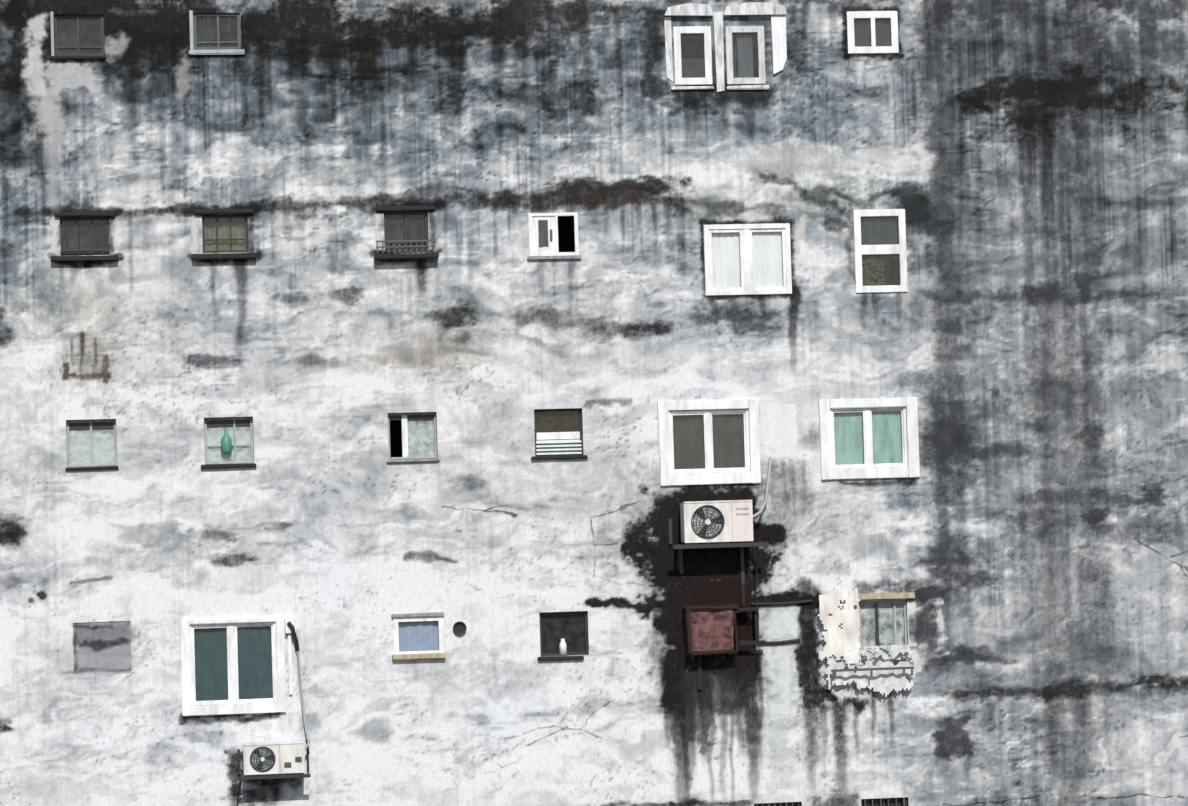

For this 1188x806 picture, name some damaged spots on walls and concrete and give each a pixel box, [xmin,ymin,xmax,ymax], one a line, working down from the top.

damp [0,0,774,142]
damp [15,203,208,217]
damp [231,185,520,218]
damp [753,168,852,231]
damp [871,0,1188,497]
damp [0,518,25,544]
damp [1068,494,1119,527]
damp [860,536,998,669]
flaking render [905,598,949,682]
flaking render [819,660,844,700]
damp [953,675,1188,703]
damp [931,715,973,761]